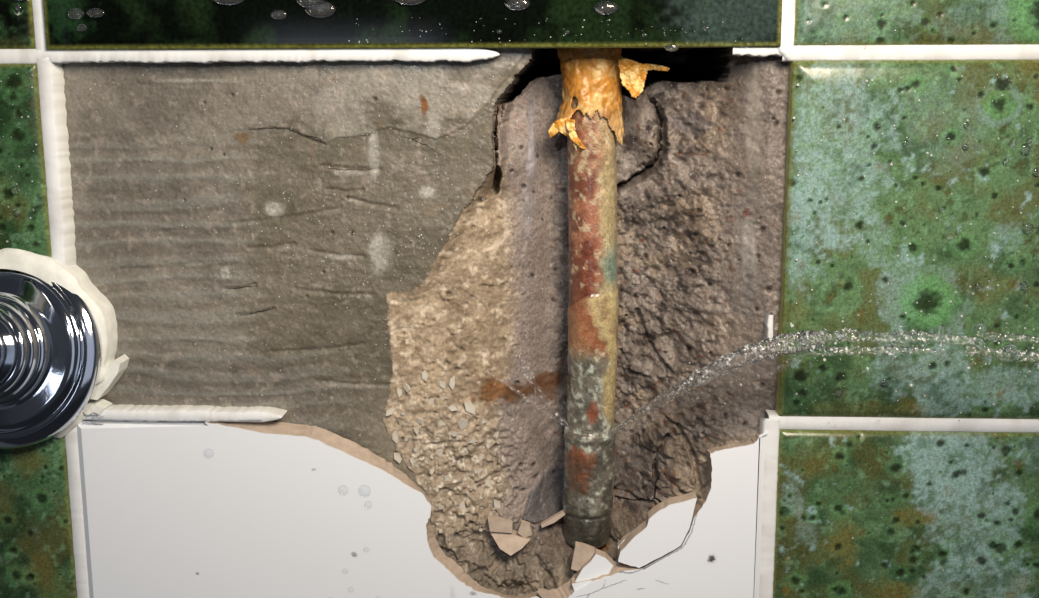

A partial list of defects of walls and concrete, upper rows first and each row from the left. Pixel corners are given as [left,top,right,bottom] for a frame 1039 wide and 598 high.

crack [617,96,663,187]
spalling [382,48,576,596]
spalling [596,47,789,562]
peeling [82,354,129,415]
rust [472,373,561,402]